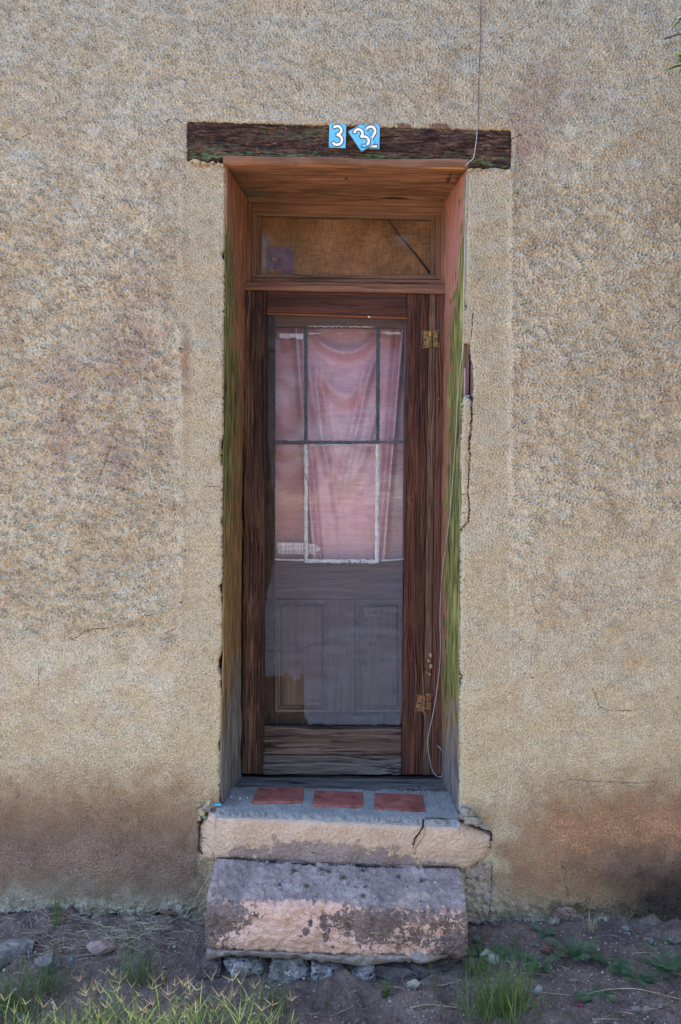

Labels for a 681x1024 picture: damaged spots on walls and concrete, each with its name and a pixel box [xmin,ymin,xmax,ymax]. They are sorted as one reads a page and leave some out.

crack [460,397,479,531]
damp [0,791,204,918]
crack [197,814,492,868]
peeling [197,800,493,962]
damp [499,786,681,926]